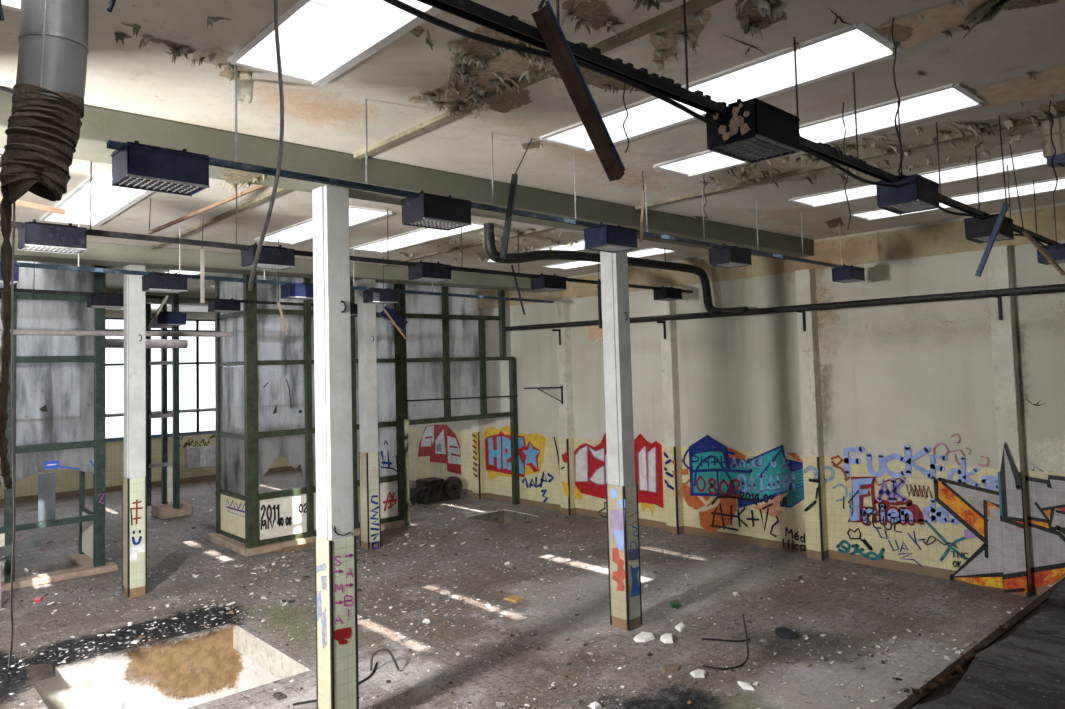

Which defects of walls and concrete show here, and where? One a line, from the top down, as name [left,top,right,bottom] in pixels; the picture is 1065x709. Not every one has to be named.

peeling [114,23,255,104]
peeling [408,25,561,119]
peeling [561,0,625,40]
peeling [579,66,641,95]
peeling [632,0,674,13]
peeling [649,10,712,73]
peeling [733,0,787,41]
peeling [877,0,1059,57]
peeling [713,103,750,141]
peeling [914,65,1065,165]
peeling [702,135,913,189]